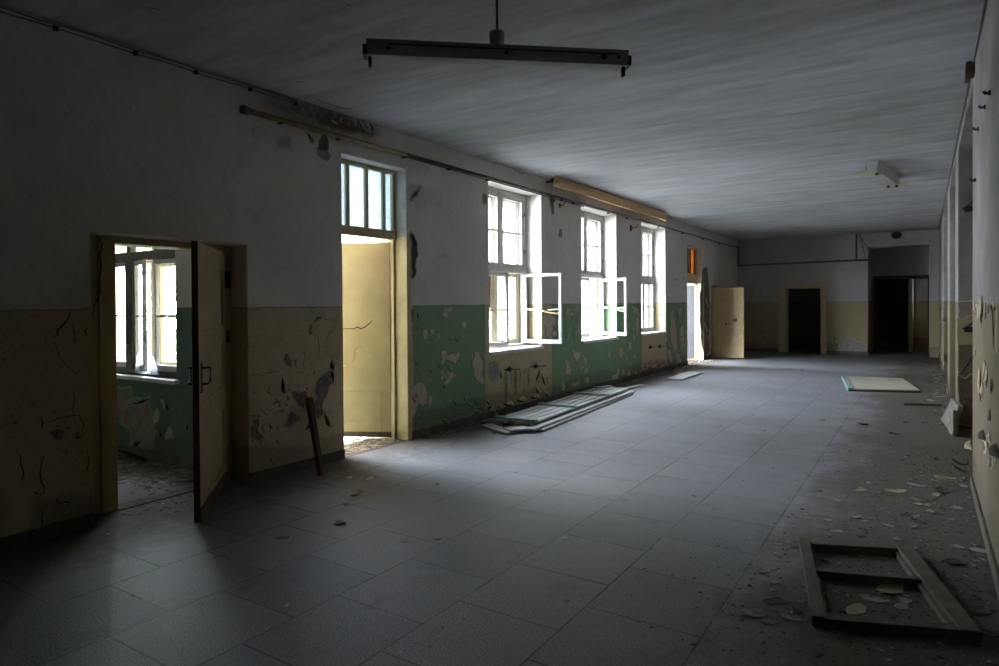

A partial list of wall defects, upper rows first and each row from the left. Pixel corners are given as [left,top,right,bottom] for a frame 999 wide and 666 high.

spalling [307,114,377,161]
spalling [409,231,419,279]
crack [40,234,103,473]
peeling [117,385,188,451]
peeling [249,351,338,448]
crack [255,306,378,386]
spalling [411,308,485,419]
peeling [486,301,589,415]
peeling [608,301,639,380]
peeling [664,307,686,364]
spalling [953,295,997,437]
peeling [981,433,996,469]